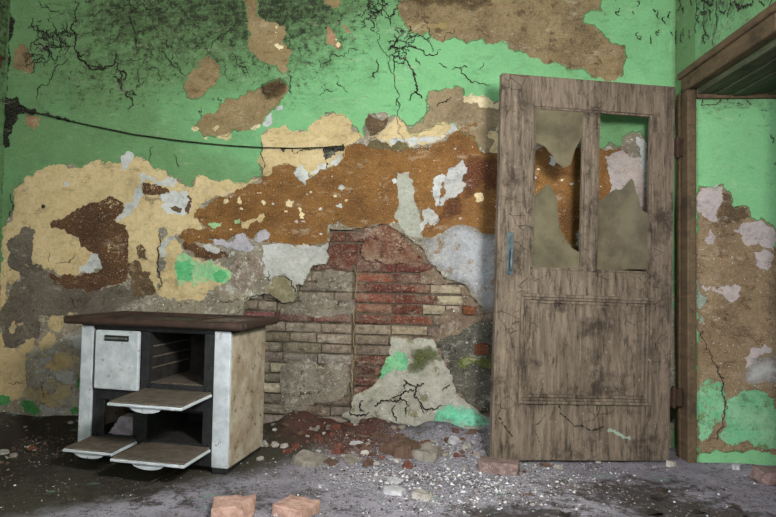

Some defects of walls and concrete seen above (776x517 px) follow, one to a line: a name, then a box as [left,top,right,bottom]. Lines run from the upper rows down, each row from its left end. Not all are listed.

leakage [25,18,79,74]
crack [36,1,186,109]
crack [320,16,486,138]
peeling [396,0,628,82]
crack [694,0,772,44]
peeling [600,130,648,166]
peeling [0,0,499,424]
peeling [696,184,776,455]
crack [700,331,726,441]